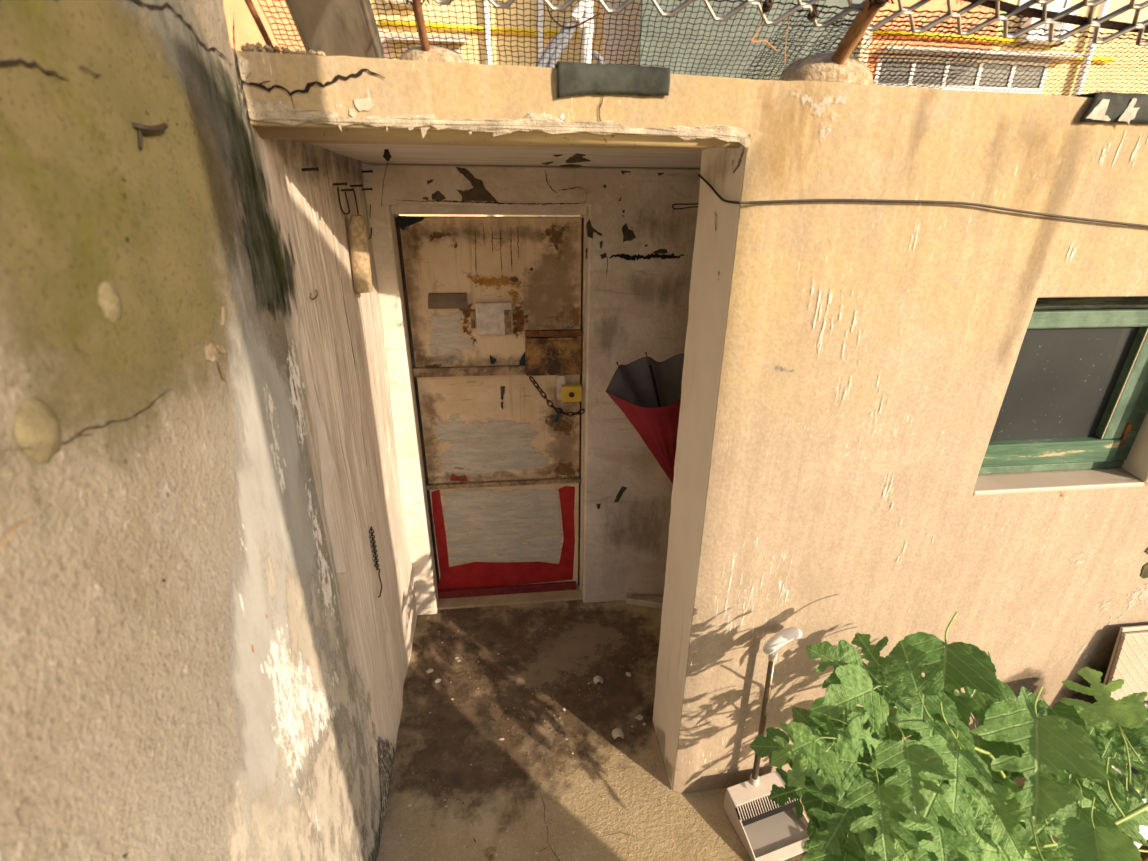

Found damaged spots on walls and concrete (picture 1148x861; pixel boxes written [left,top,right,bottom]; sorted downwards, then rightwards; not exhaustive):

crack [0,58,102,80]
crack [134,0,385,141]
peeling [542,153,591,167]
peeling [423,167,499,203]
leakage [266,217,287,300]
peeling [397,216,425,230]
corrosion [542,224,567,261]
corrosion [467,226,528,337]
corrosion [459,303,477,343]
crack [61,389,172,445]
flaking render [1140,548,1148,579]
peeling [223,479,385,861]